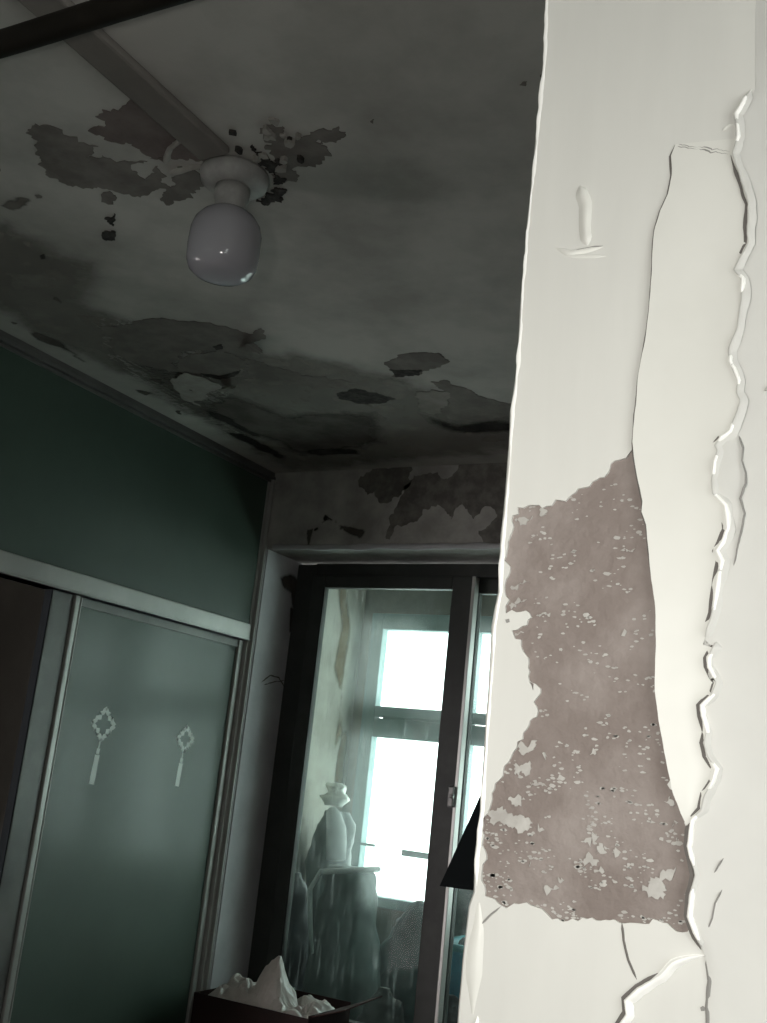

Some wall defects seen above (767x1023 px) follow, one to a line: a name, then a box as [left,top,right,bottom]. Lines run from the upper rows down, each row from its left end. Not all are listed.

leakage [3,195,42,210]
peeling [26,99,207,241]
peeling [229,117,346,206]
leakage [0,225,510,468]
peeling [358,0,748,932]
crack [615,89,757,1023]